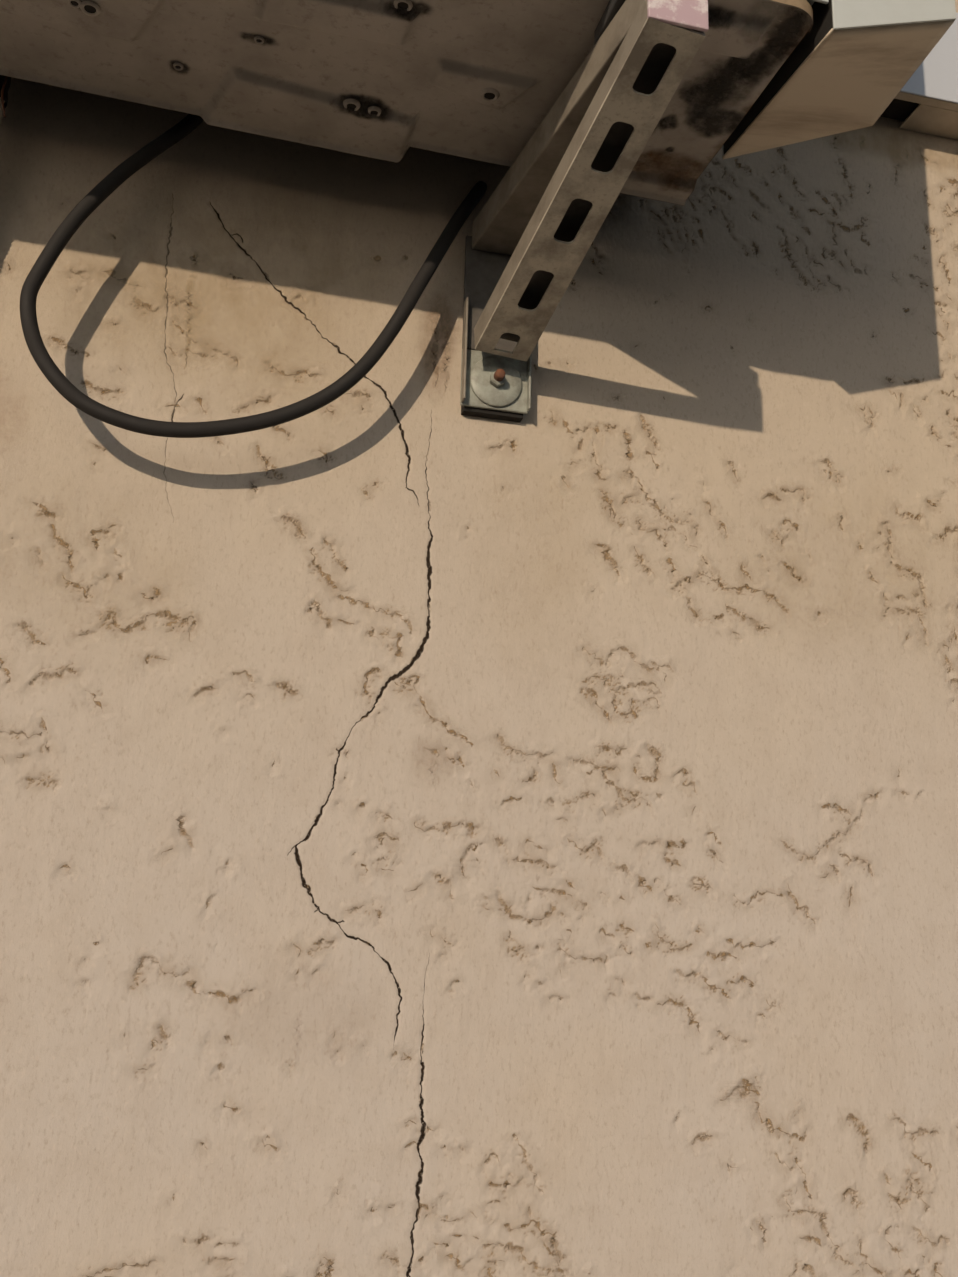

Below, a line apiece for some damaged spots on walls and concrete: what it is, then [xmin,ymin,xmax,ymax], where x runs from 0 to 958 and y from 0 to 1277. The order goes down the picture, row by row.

crack [210,203,433,1277]